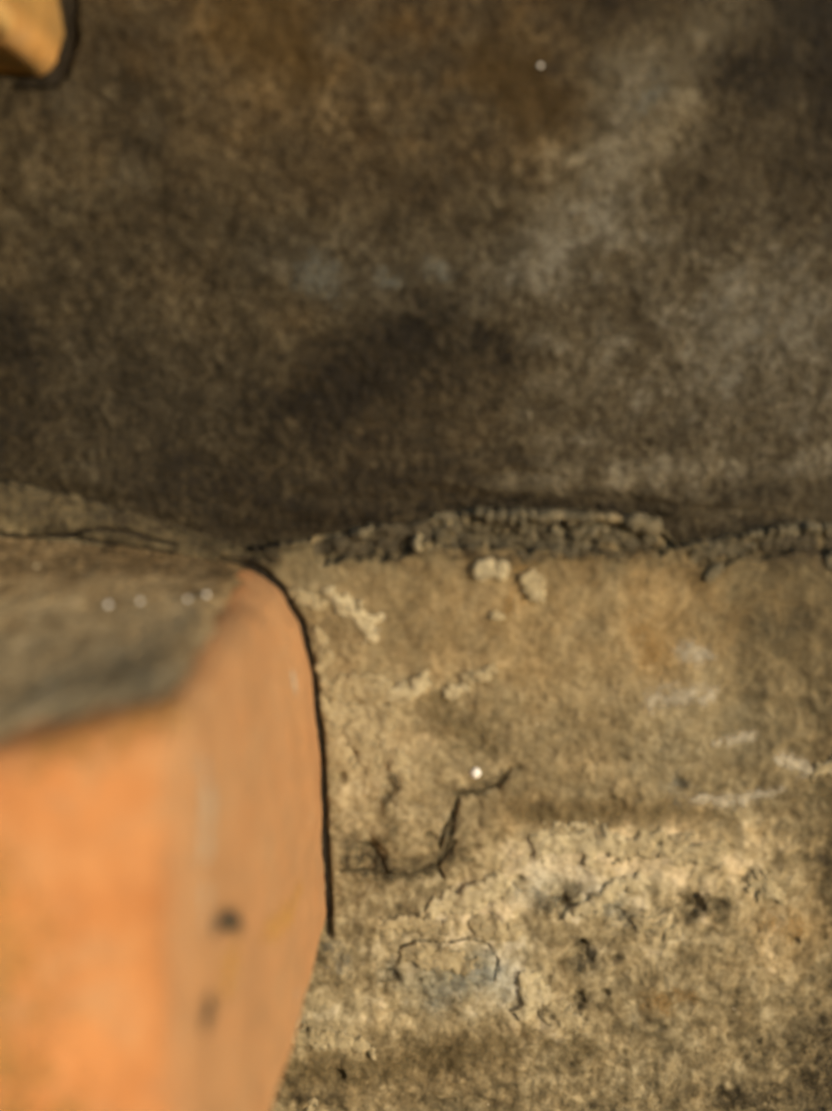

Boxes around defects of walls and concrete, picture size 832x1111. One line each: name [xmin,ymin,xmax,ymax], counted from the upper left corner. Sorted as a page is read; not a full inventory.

crack [0,527,176,553]
crack [219,560,509,934]